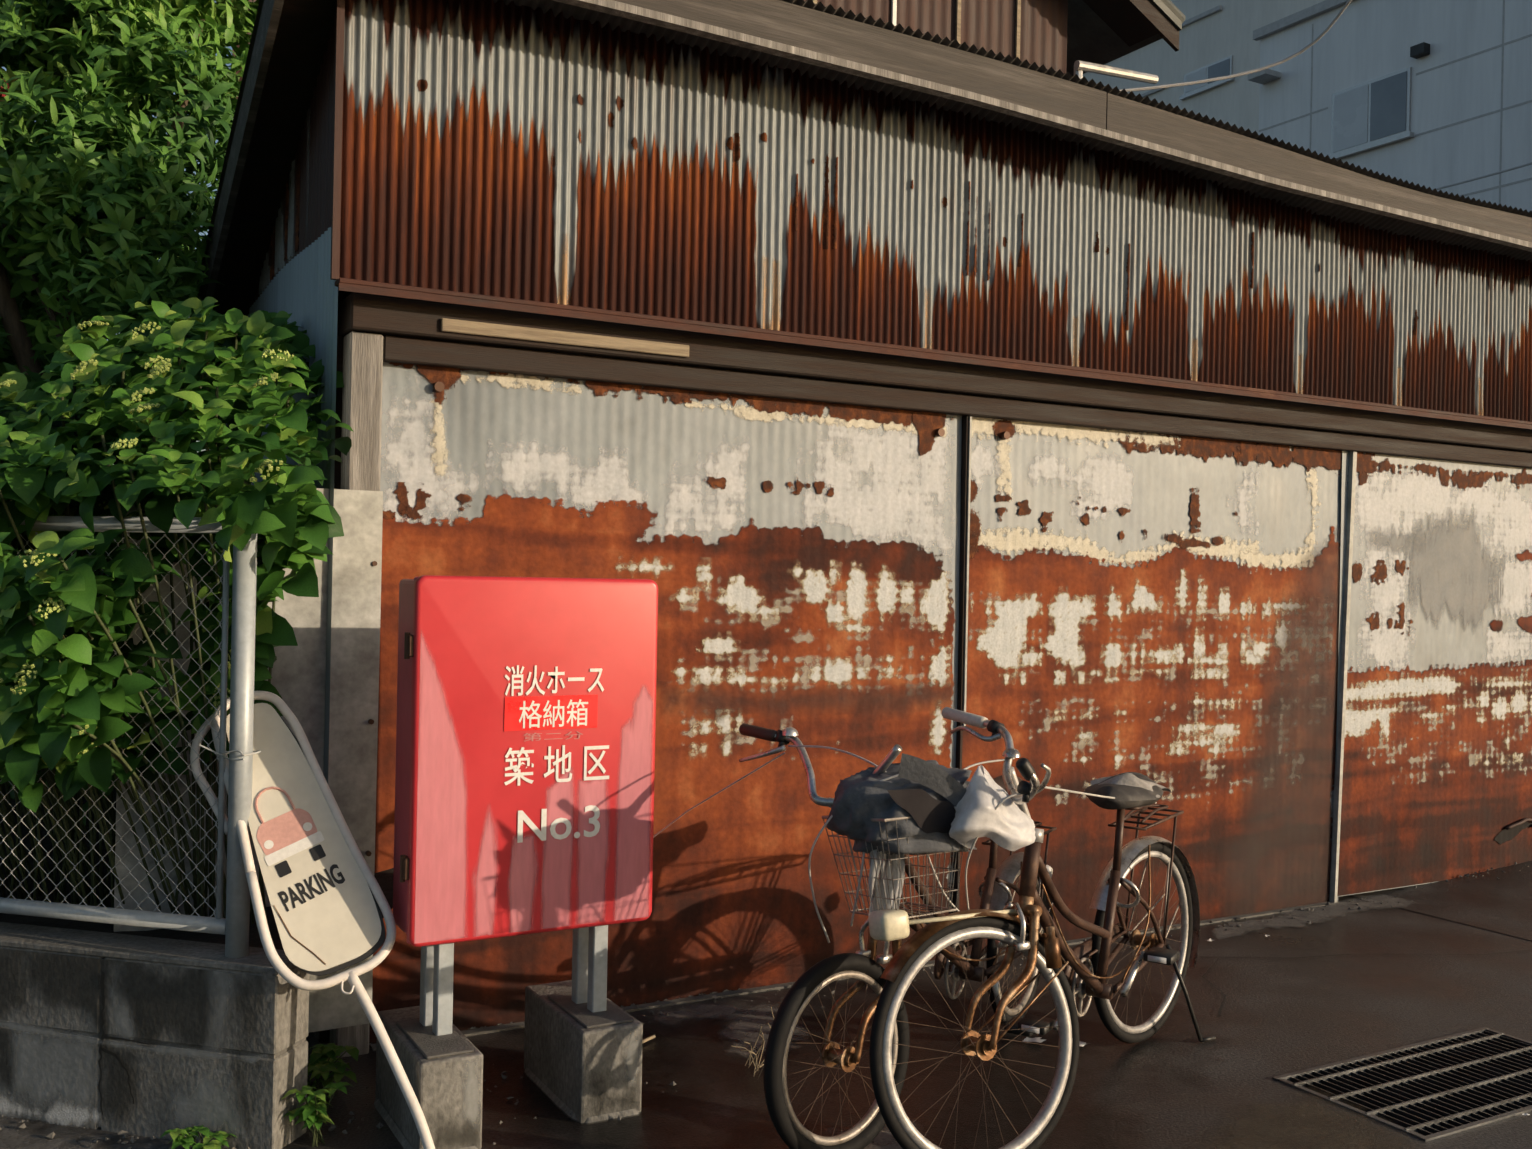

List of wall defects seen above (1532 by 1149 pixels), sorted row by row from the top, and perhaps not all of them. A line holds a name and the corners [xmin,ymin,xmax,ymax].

rust [339,0,1532,422]
peeling [384,398,647,524]
peeling [460,373,582,394]
peeling [616,558,673,575]
rust [374,362,1532,1007]
peeling [665,401,1321,763]
peeling [1344,468,1532,766]
water stain [0,949,260,1134]
rust [369,908,421,1044]
rust [452,929,573,1031]